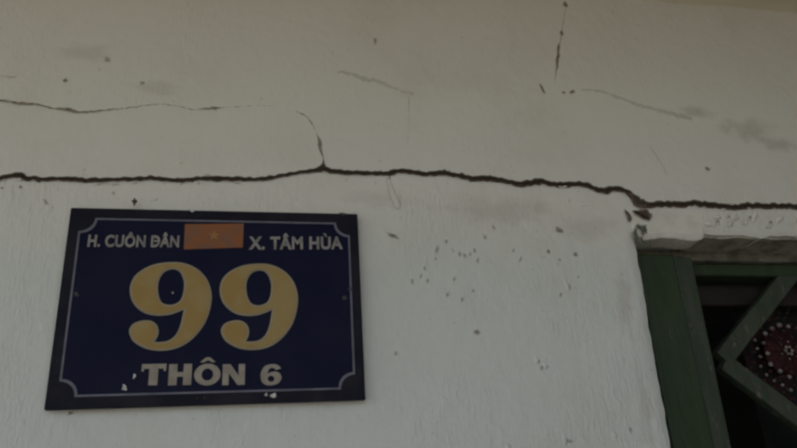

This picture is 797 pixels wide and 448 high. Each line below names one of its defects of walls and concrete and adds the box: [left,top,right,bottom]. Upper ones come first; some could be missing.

crack [539,31,575,94]
crack [0,99,224,113]
crack [0,113,797,211]